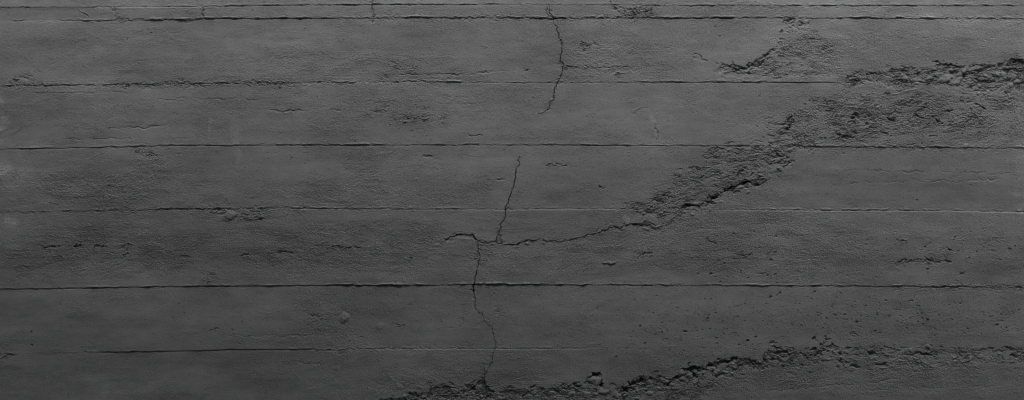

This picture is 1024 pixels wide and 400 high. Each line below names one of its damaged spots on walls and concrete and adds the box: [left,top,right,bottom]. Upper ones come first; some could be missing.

crack [538,6,565,114]
spalling [700,13,1024,96]
spalling [623,109,820,226]
crack [439,156,771,396]
spalling [380,357,763,400]